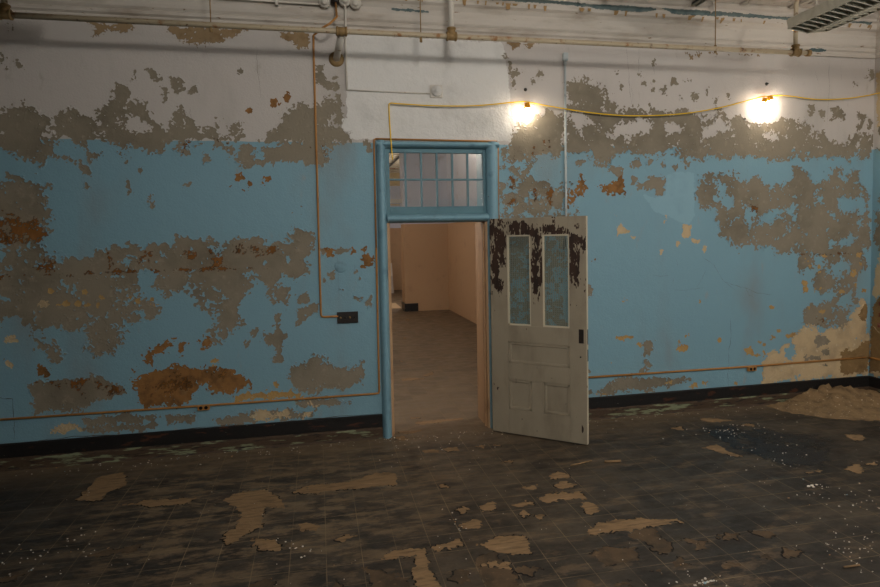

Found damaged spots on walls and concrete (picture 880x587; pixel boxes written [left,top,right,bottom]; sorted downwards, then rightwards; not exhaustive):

peeling [0,63,375,435]
peeling [589,335,708,397]